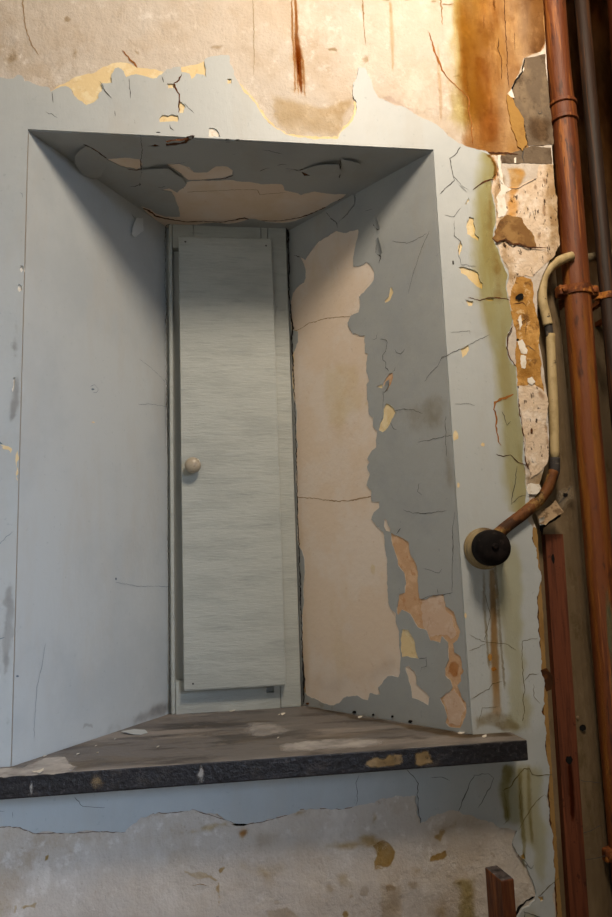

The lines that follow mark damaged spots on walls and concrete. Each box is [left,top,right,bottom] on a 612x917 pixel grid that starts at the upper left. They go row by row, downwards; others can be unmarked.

corrosion [463,0,498,95]
crack [428,0,494,266]
spalling [488,54,554,184]
peeling [28,130,432,275]
spalling [492,164,560,298]
crack [424,326,516,382]
spalling [510,276,544,391]
peeling [288,150,472,734]
corrosion [570,328,592,551]
crack [470,595,537,721]
crack [407,768,552,826]
crack [516,878,559,917]